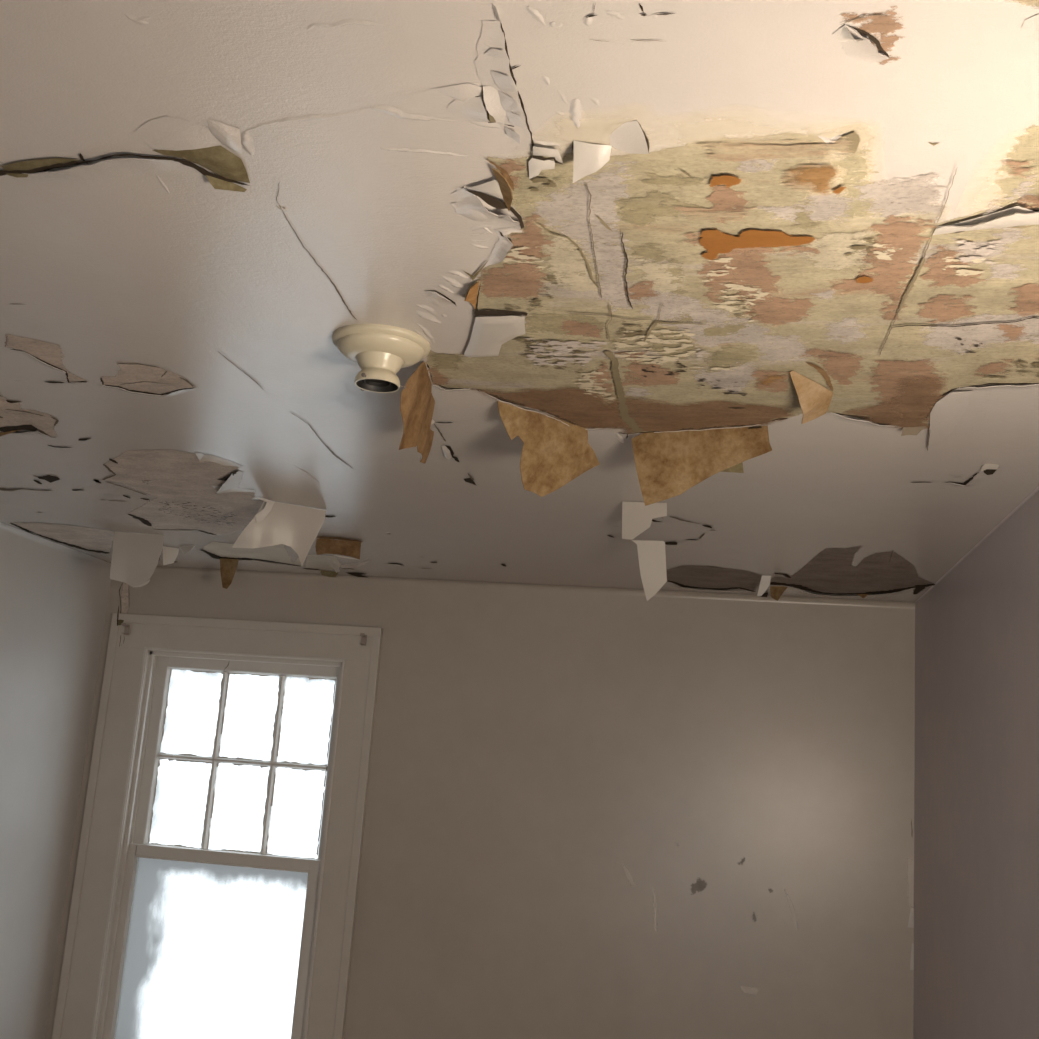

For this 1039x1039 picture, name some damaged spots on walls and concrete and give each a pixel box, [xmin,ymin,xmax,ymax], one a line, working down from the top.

peeling [832,6,903,65]
peeling [1009,0,1039,42]
peeling [0,116,255,193]
crack [276,182,357,320]
peeling [5,334,198,398]
peeling [399,120,1039,601]
peeling [0,394,59,438]
peeling [10,450,372,589]